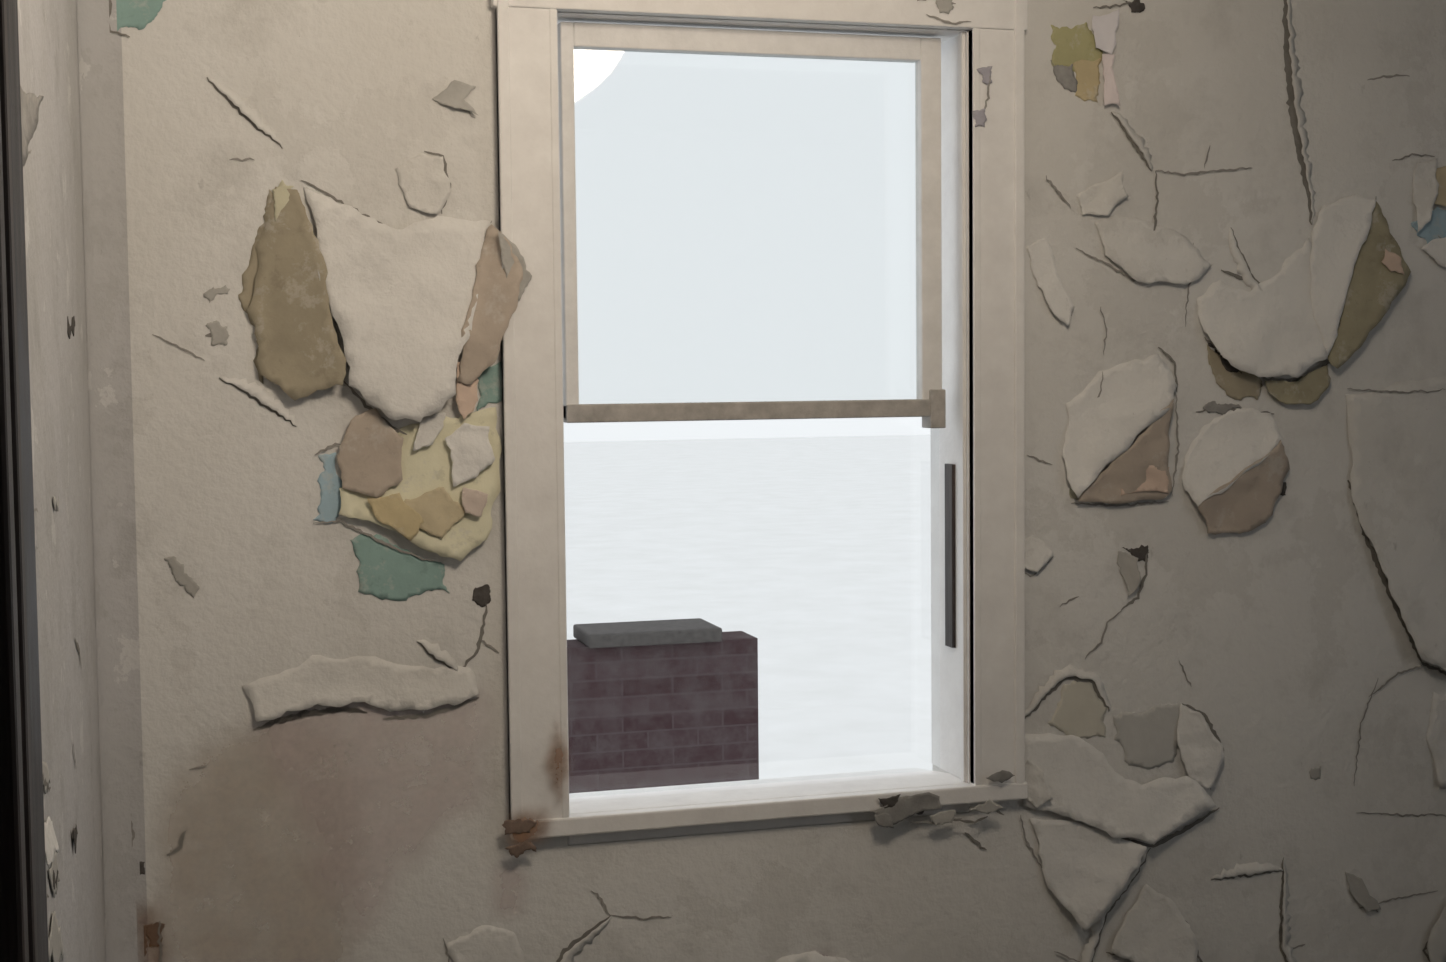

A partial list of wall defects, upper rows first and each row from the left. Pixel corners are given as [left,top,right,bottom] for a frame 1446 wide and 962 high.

peeling [109,0,166,37]
crack [1282,0,1316,225]
crack [1368,73,1410,81]
crack [1392,153,1435,161]
peeling [1027,0,1411,535]
peeling [203,151,532,601]
spalling [417,584,499,671]
rust [550,744,565,785]
peeling [872,545,1224,962]
rust [502,815,543,858]
damp [143,921,165,962]
crack [556,891,672,962]